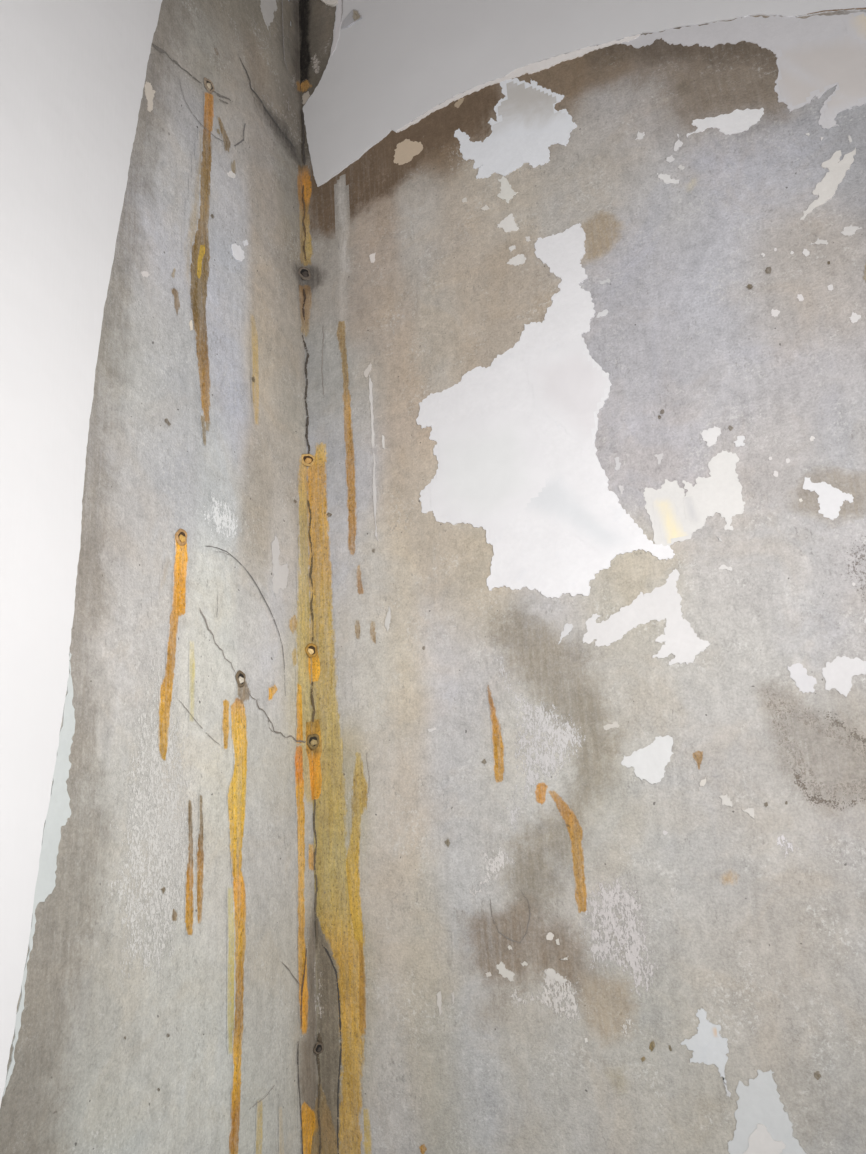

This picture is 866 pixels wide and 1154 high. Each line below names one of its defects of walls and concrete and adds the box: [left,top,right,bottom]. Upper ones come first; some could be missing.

rust [170,91,237,447]
crack [153,44,307,261]
crack [302,289,324,454]
water stain [253,18,817,296]
rust [152,532,196,761]
crack [199,608,315,743]
crack [307,500,315,642]
spalling [304,7,866,1154]
rust [171,794,205,936]
rust [222,697,248,1154]
crack [312,798,320,948]
rust [289,441,373,1154]